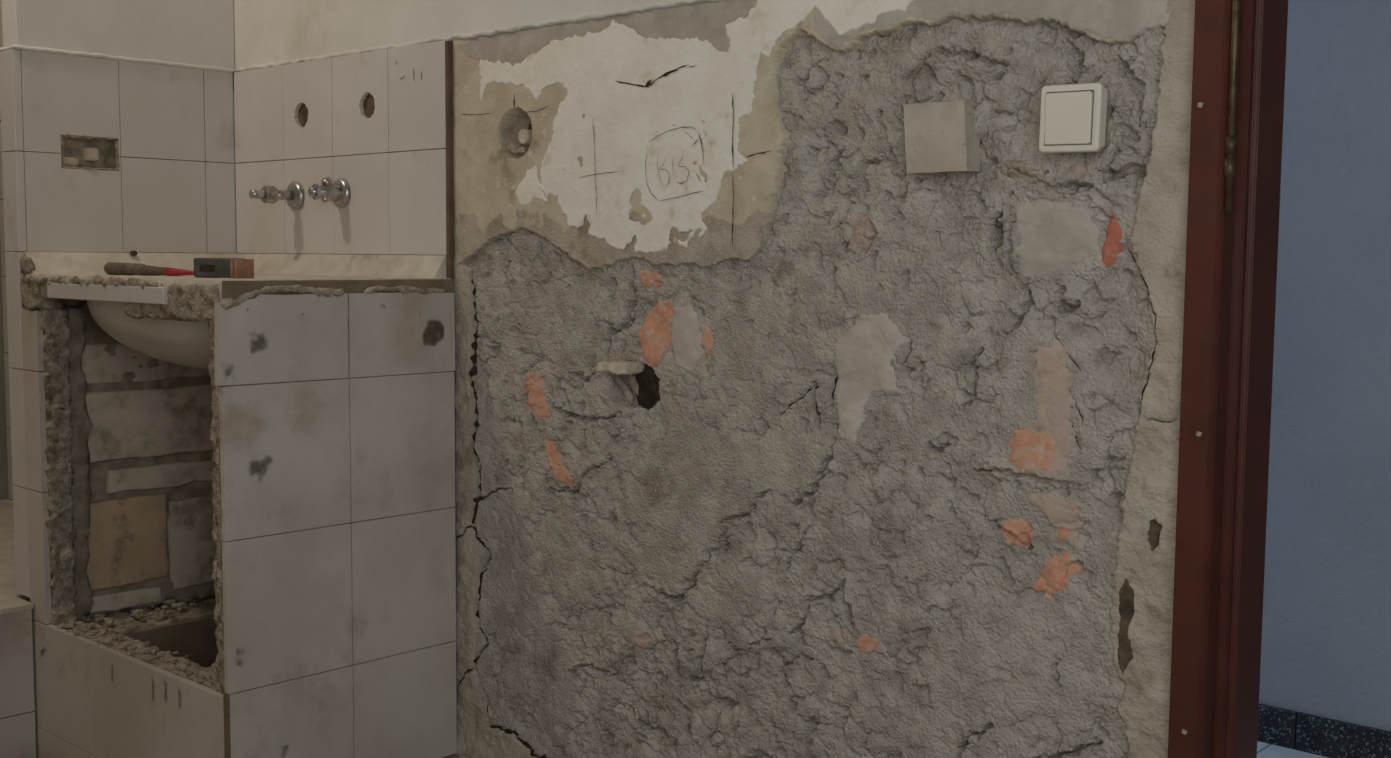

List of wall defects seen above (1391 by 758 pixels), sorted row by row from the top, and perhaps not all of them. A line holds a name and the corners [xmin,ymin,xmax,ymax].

spalling [297,103,308,127]
spalling [362,93,375,118]
flaking render [76,292,455,617]
crack [456,279,512,686]
spalling [459,0,1169,758]
crack [486,704,547,758]